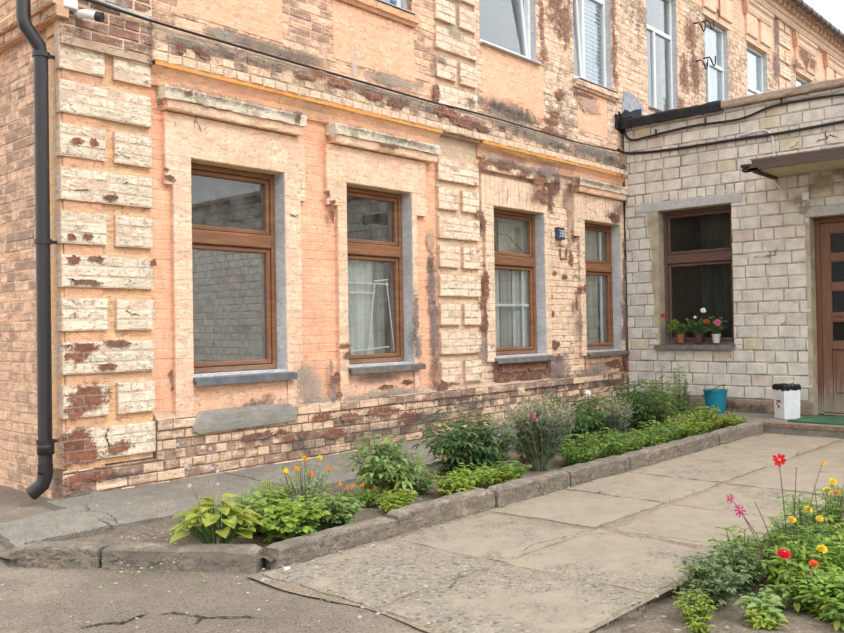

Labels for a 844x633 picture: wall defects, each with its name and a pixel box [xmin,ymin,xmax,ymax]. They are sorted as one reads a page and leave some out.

water stain [209,28,323,65]
peeling [538,0,574,69]
peeling [676,11,701,109]
water stain [485,98,532,122]
water stain [575,144,615,161]
peeling [478,158,586,268]
peeling [65,255,106,264]
water stain [412,258,439,364]
peeling [59,339,137,371]
water stain [433,380,485,403]
peeling [53,379,135,496]
crack [76,612,263,629]